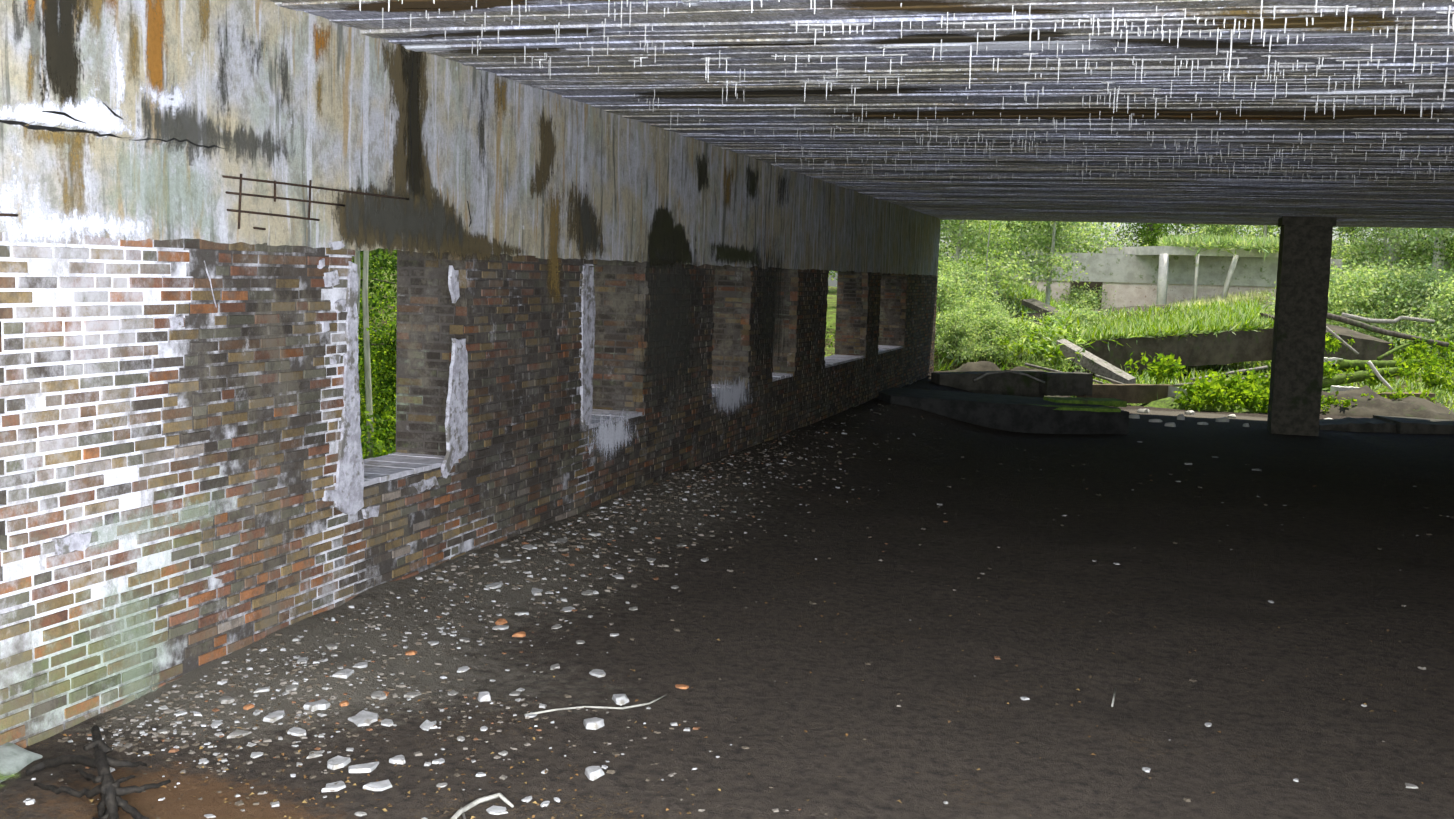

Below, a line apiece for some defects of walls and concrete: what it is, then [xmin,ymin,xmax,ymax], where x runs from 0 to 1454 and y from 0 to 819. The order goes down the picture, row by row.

leakage [13,0,92,108]
rust [78,0,117,34]
crack [0,102,224,149]
leakage [112,41,125,109]
rust [129,0,165,105]
rust [199,0,210,41]
leakage [142,25,290,168]
spalling [222,174,409,230]
leakage [333,42,523,264]
leakage [530,113,605,302]
leakage [635,206,789,418]